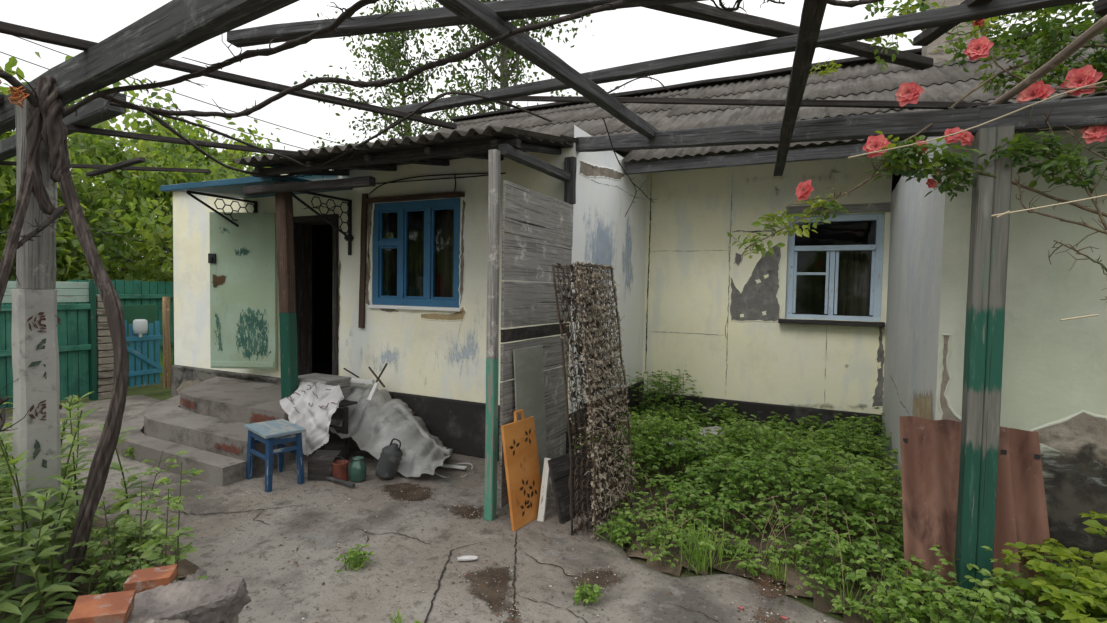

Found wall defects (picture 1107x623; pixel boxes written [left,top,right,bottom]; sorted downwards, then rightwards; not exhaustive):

flaking render [579,160,625,181]
flaking render [728,242,782,323]
flaking render [912,333,962,422]
flaking render [1030,410,1107,464]